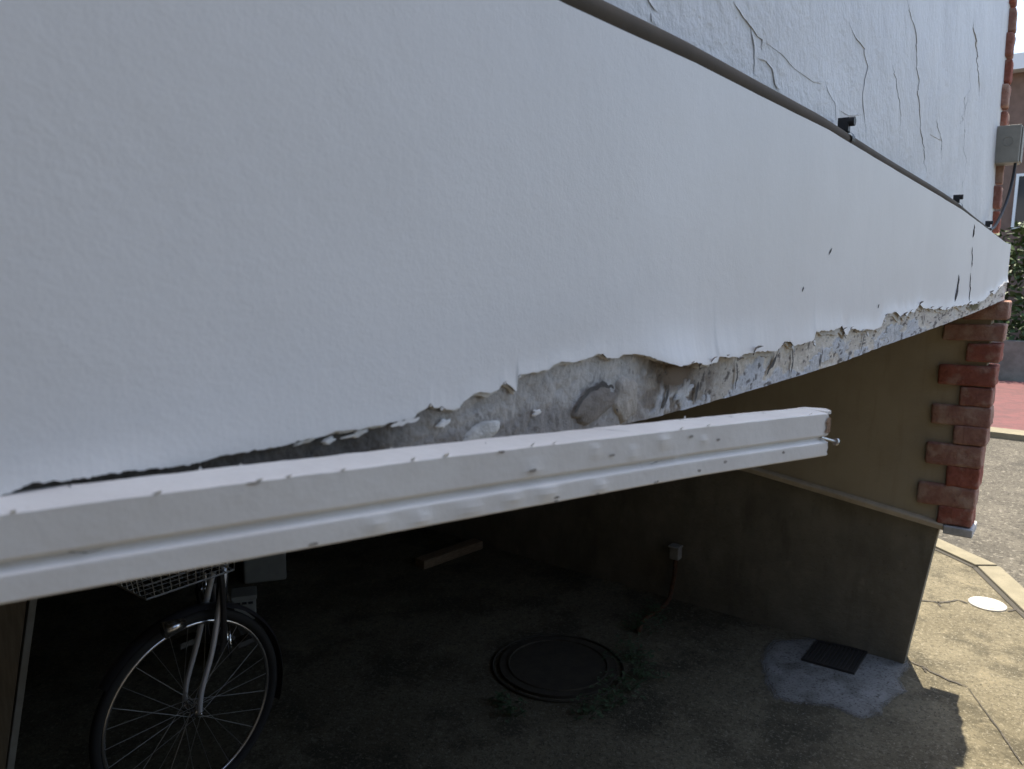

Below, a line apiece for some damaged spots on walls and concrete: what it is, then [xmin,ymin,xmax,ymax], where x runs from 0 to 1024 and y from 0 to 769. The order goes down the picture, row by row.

crack [733,1,838,121]
crack [849,0,980,187]
crack [955,224,975,307]
peeling [11,283,1007,493]